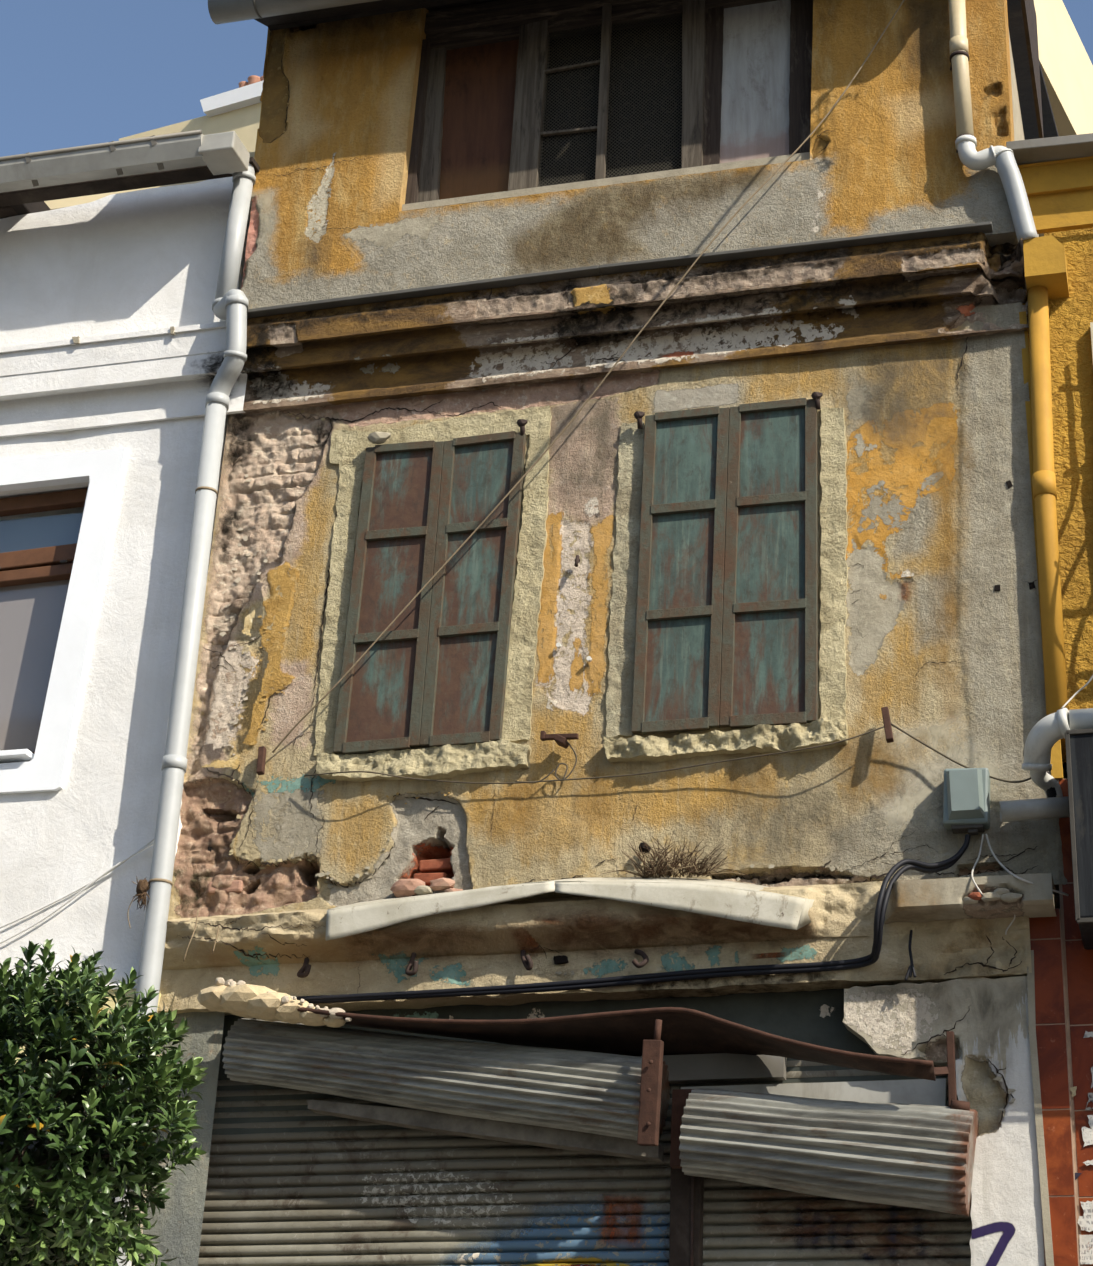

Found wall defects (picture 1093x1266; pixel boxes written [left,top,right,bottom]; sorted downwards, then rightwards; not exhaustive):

flaking render [259,29,290,143]
peeling [304,152,337,243]
spalling [901,236,1029,341]
crack [283,402,501,443]
peeling [846,385,960,676]
flaking render [174,262,860,918]
crack [944,936,1022,975]
peeling [819,987,1016,1136]